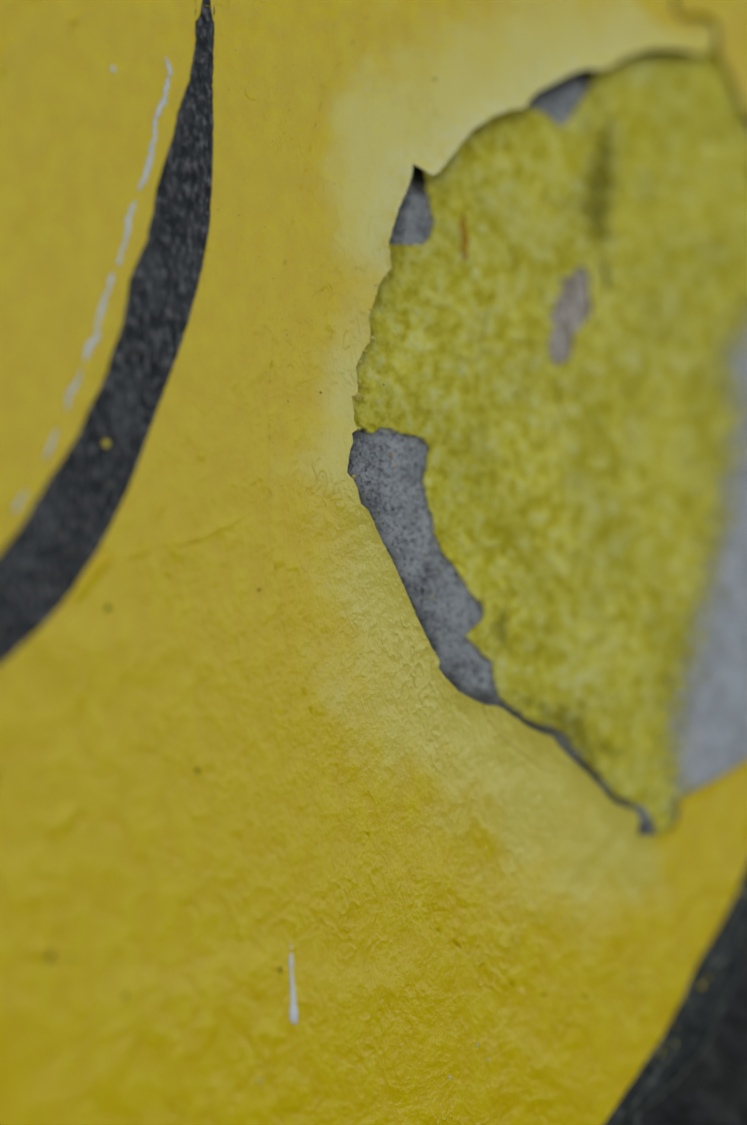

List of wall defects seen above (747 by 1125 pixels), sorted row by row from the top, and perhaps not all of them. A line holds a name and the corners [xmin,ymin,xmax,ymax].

peeling [268,0,747,1001]
peeling [603,867,747,1125]